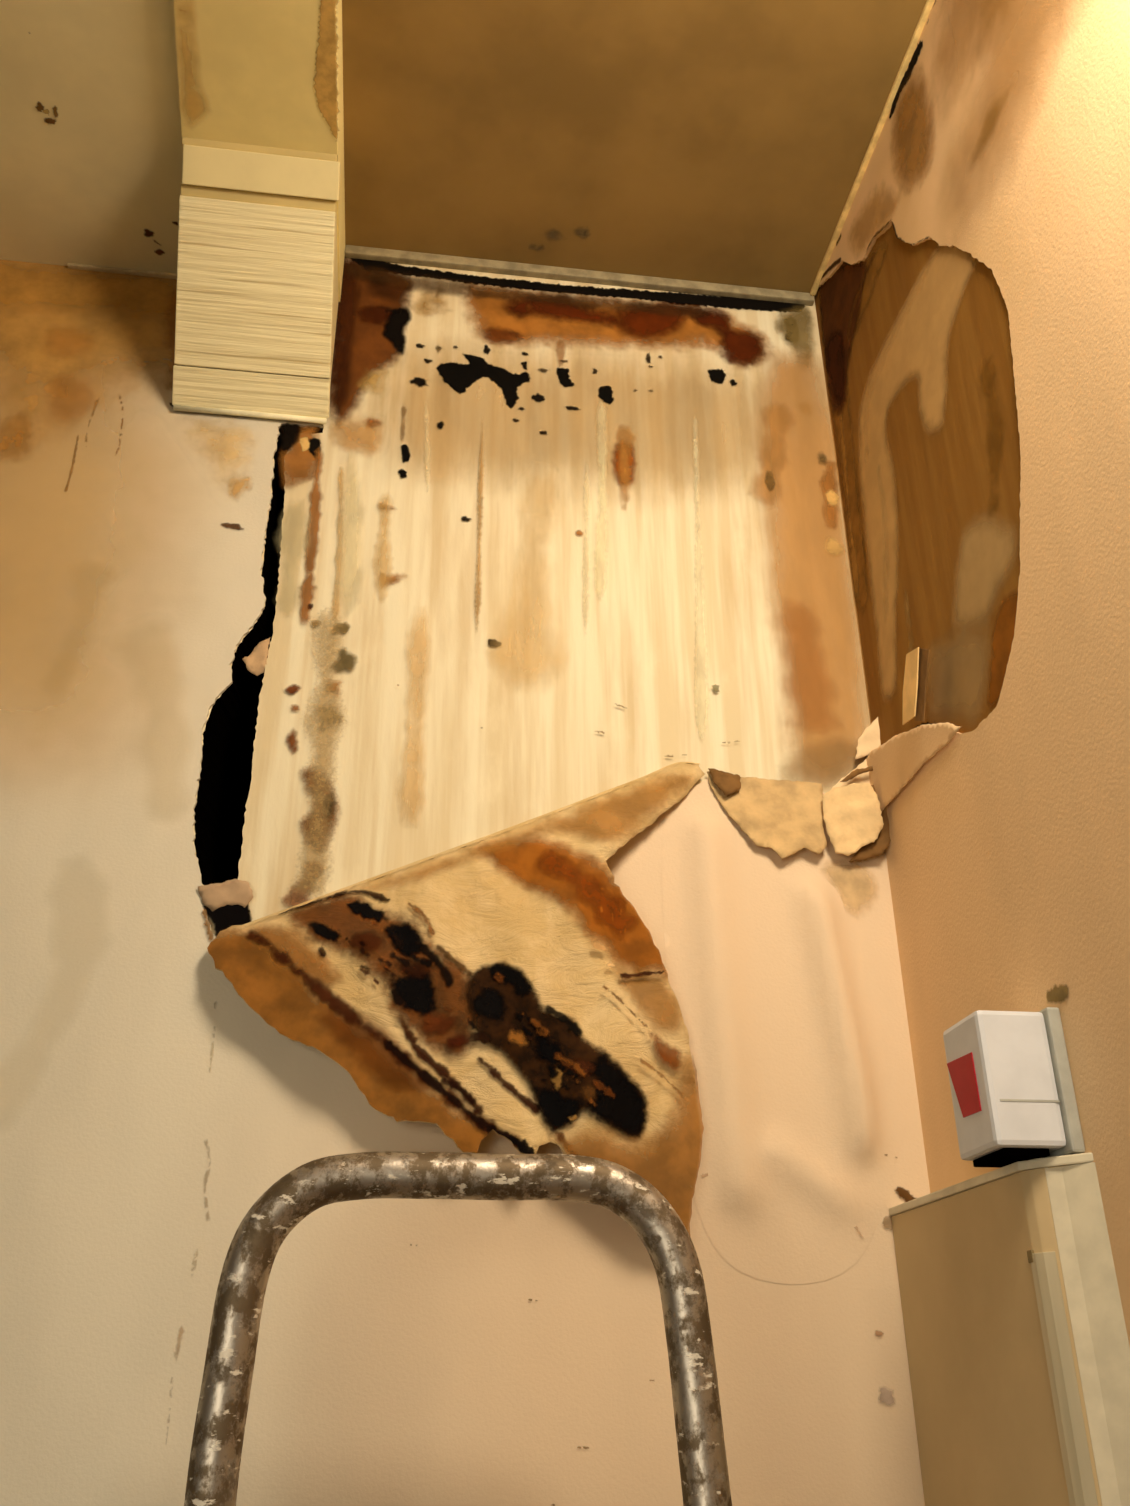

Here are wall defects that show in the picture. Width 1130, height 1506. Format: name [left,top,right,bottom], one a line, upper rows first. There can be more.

damp [895,82,931,179]
damp [383,308,574,422]
damp [593,369,614,404]
damp [708,369,737,386]
damp [0,259,177,685]
damp [398,444,410,478]
damp [462,437,483,624]
peeling [230,225,1021,921]
damp [765,246,886,776]
damp [828,866,874,909]